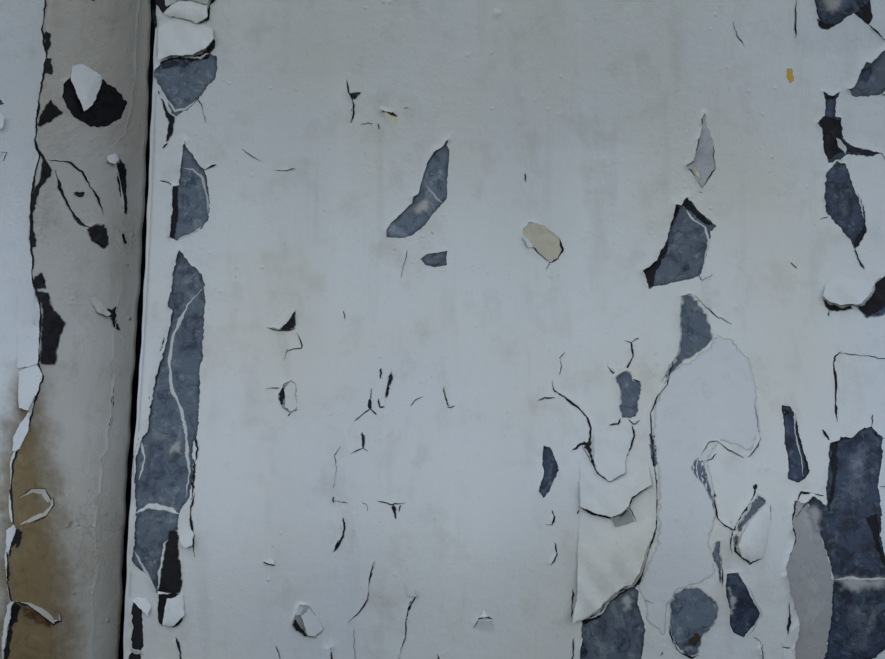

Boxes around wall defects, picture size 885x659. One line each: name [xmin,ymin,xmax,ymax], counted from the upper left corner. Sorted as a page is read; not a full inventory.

peeling [56,64,134,134]
peeling [124,0,224,659]
peeling [378,130,458,272]
peeling [517,217,567,268]
peeling [607,107,725,427]
peeling [809,0,885,328]
crack [347,560,375,659]
crack [390,583,416,659]
crack [535,352,673,590]
peeling [572,430,659,659]
peeling [664,491,772,659]
peeling [774,398,885,659]